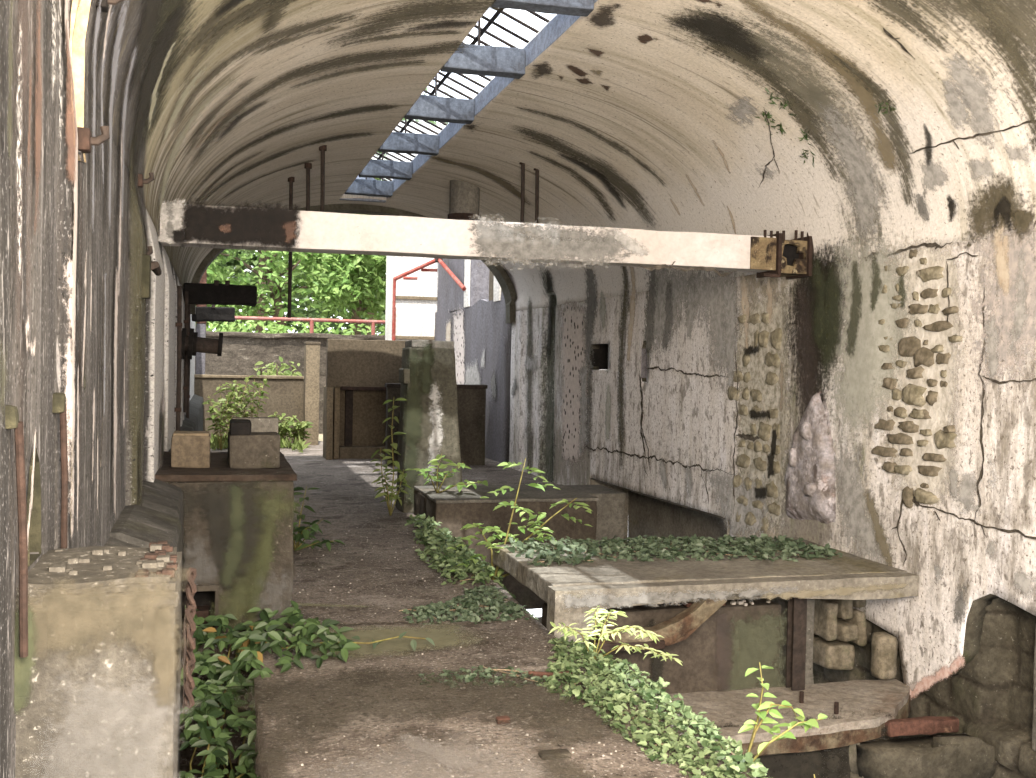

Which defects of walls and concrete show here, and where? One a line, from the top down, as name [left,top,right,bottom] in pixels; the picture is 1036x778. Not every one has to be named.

corrosion [15,0,42,331]
corrosion [65,21,77,180]
spalling [70,0,91,127]
water stain [52,0,340,537]
water stain [342,20,478,47]
spalling [727,288,794,533]
water stain [669,8,932,418]
crack [864,242,979,322]
spalling [871,237,980,515]
water stain [868,0,997,149]
crack [891,281,1036,565]
crack [912,120,1036,153]